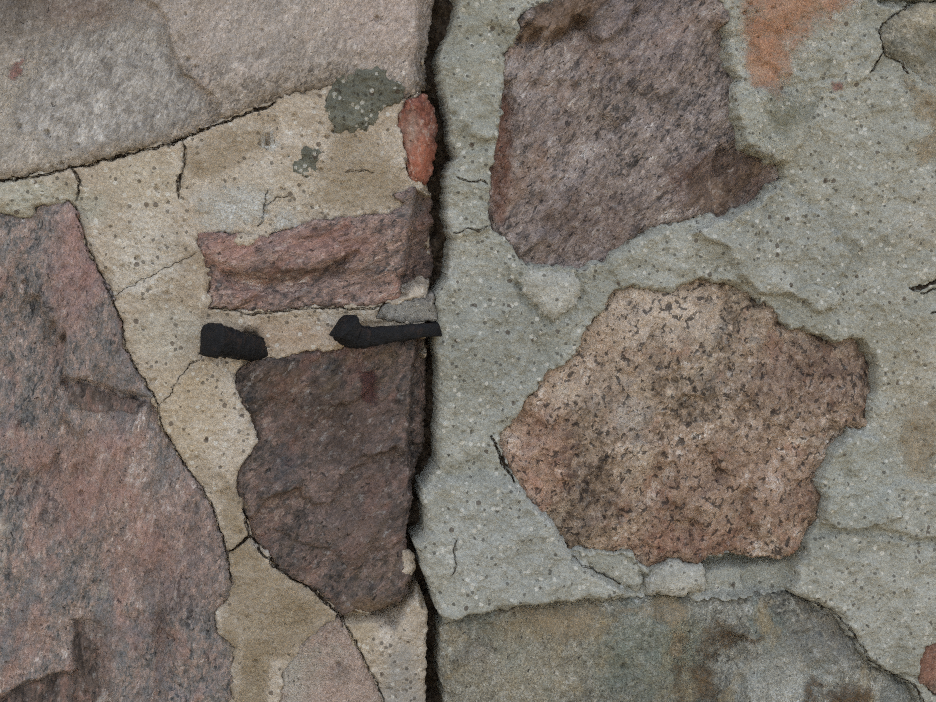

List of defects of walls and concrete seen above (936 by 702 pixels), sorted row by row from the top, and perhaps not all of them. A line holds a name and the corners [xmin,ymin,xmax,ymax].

crack [421,0,488,290]
crack [406,321,442,702]